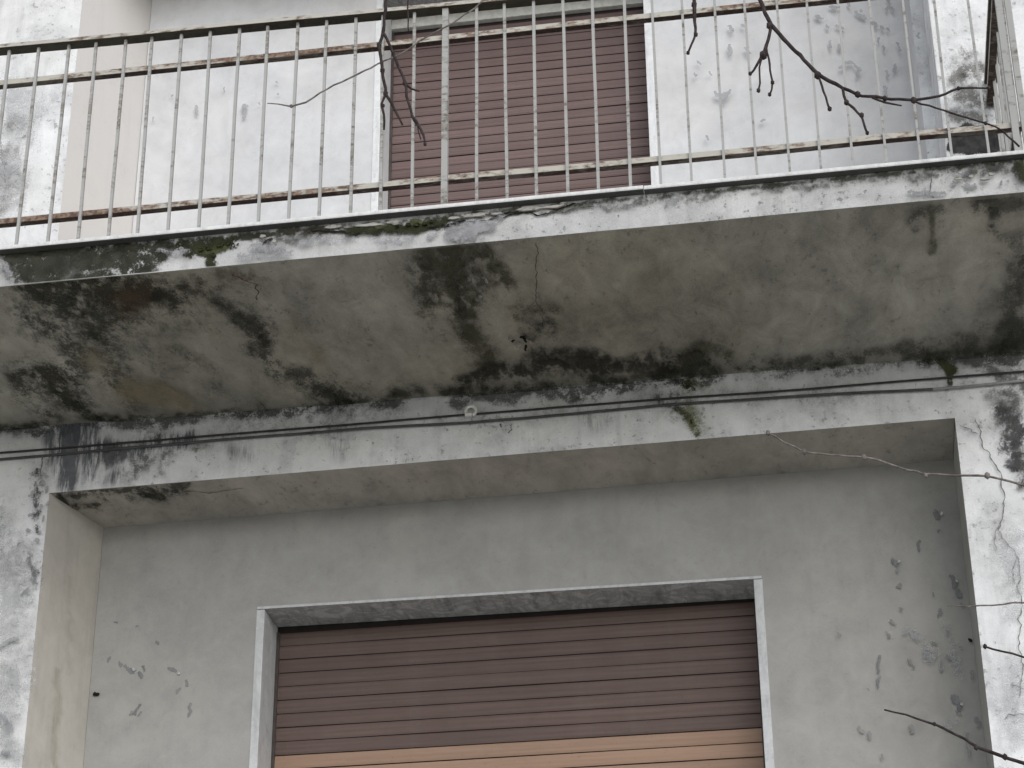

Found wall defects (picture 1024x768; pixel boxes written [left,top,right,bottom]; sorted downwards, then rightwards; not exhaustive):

leakage [0,227,425,509]
leakage [414,244,723,410]
leakage [737,197,1024,488]
crack [959,419,1024,719]